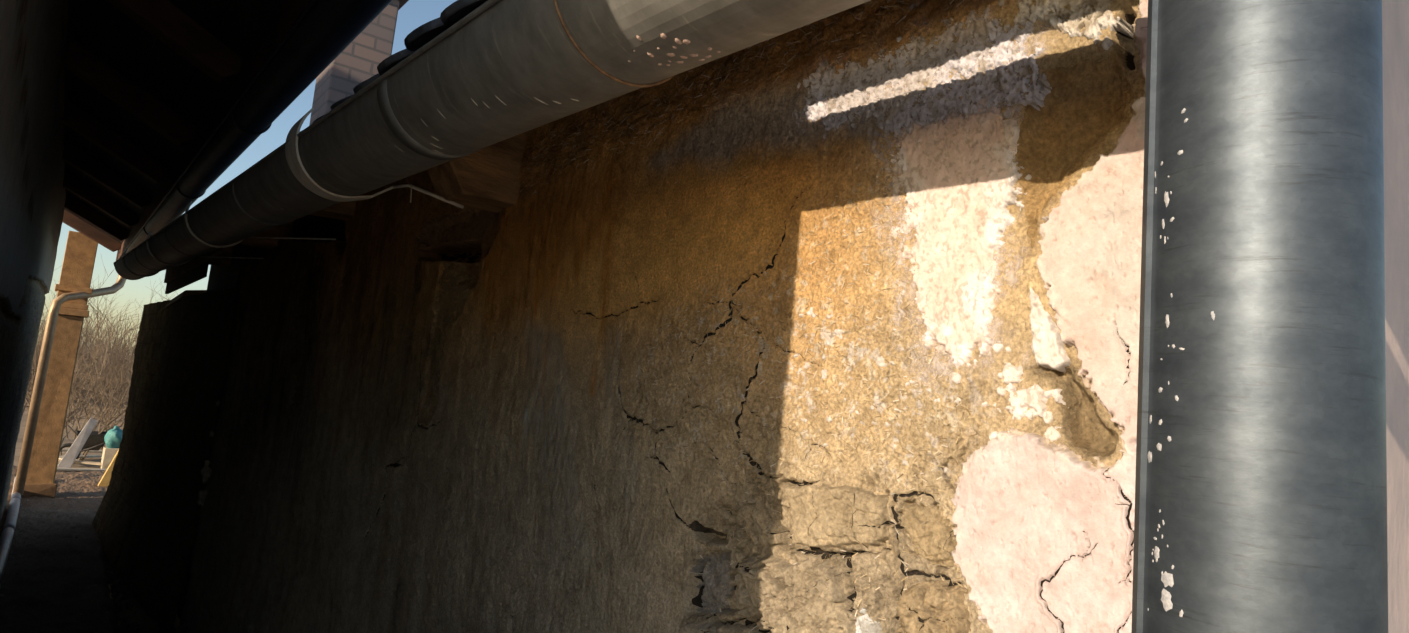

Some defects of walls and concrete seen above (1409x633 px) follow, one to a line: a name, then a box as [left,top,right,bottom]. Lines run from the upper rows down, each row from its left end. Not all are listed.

flaking render [0,0,66,320]
crack [572,192,962,633]
flaking render [782,0,1148,633]
crack [1040,468,1134,633]